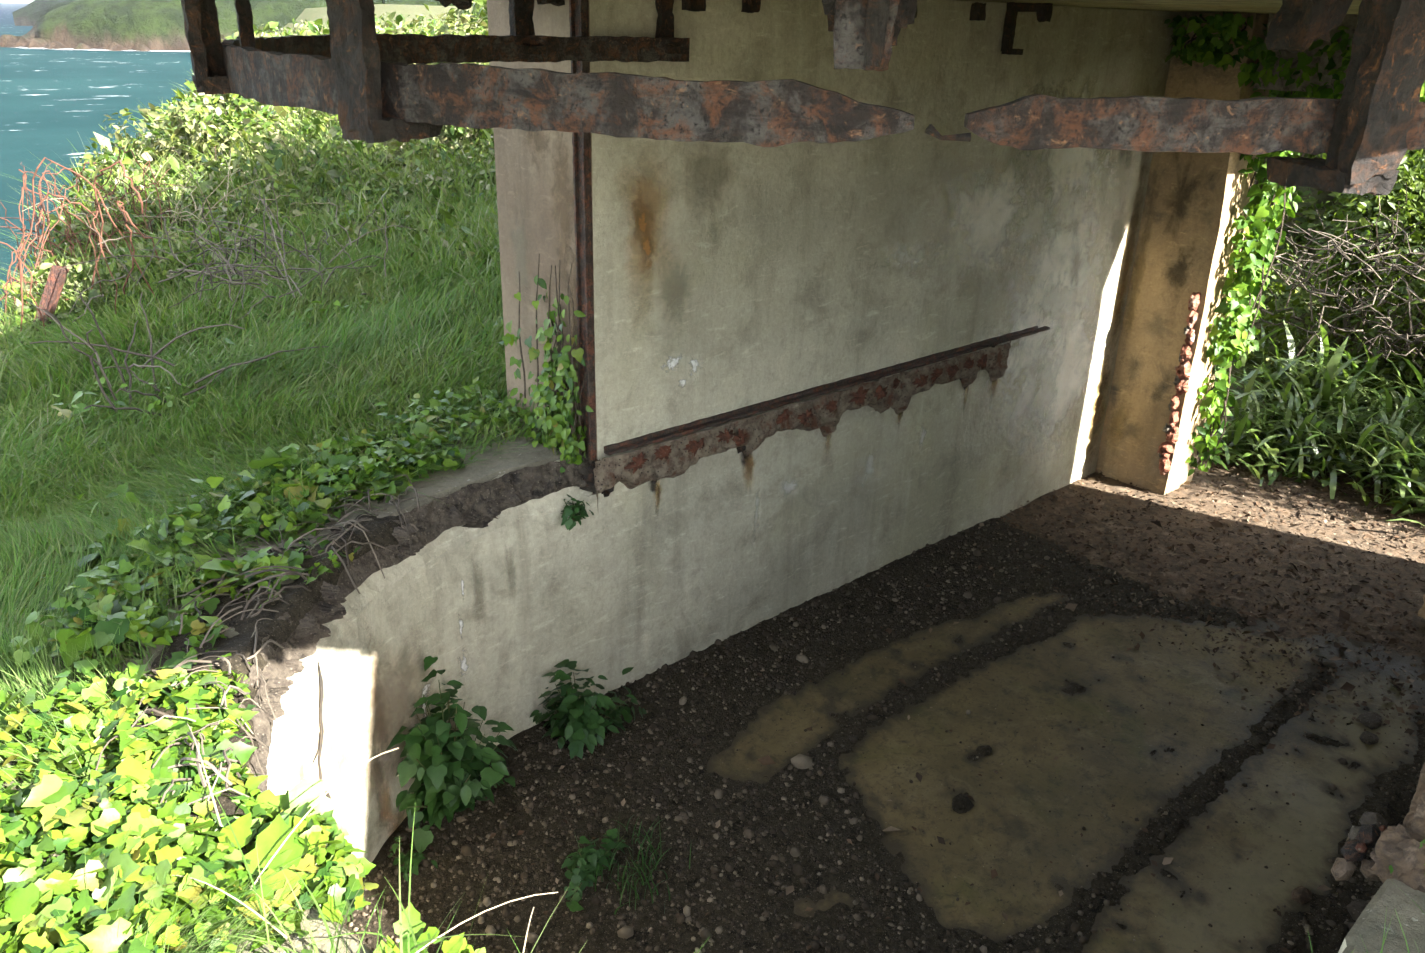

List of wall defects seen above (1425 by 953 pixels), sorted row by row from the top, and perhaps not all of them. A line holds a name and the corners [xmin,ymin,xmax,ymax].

rust [631,175,662,272]
rust [651,480,661,509]
rust [741,451,753,481]
crack [312,662,331,799]
leakage [372,662,384,732]